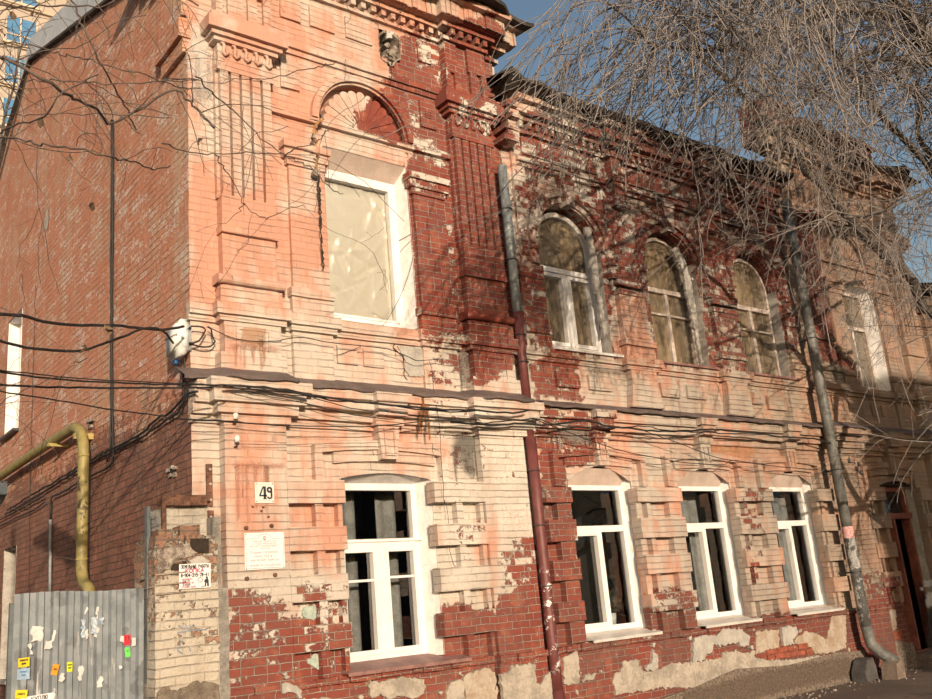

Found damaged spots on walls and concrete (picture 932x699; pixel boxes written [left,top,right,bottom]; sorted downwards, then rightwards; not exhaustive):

spalling [153,544,209,574]
peeling [301,605,316,620]
spalling [766,629,815,660]
peeling [307,654,319,670]